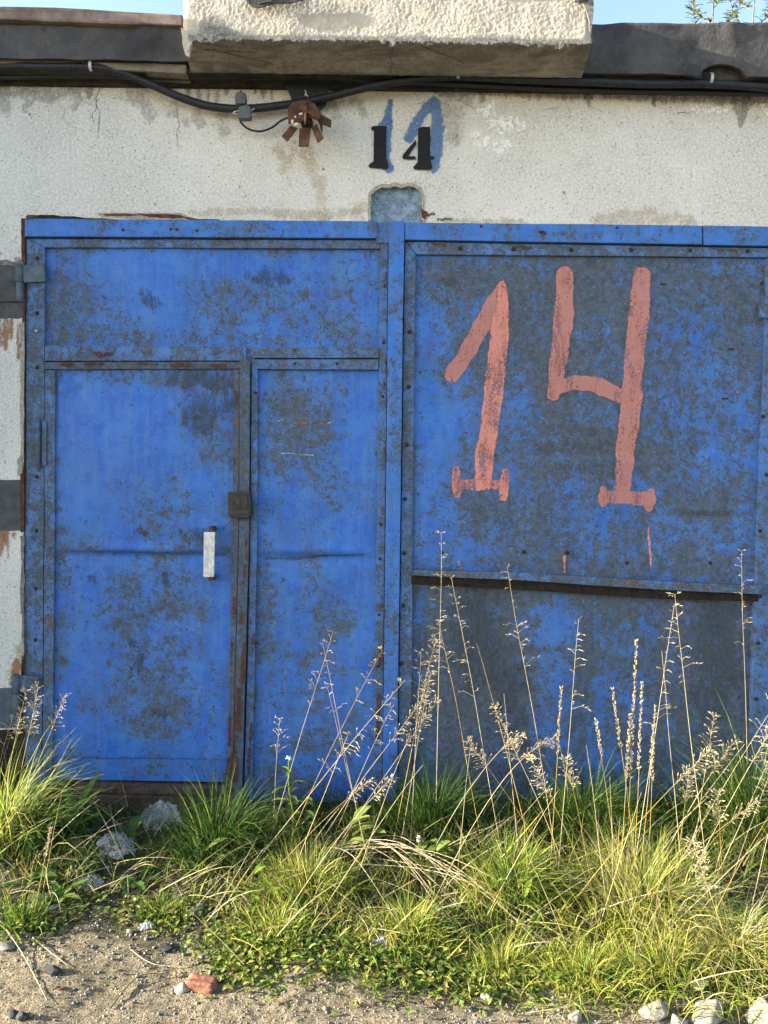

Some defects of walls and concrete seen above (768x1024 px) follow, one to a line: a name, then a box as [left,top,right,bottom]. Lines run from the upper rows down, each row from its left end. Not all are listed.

crack [31,88,123,139]
rust [225,633,255,783]